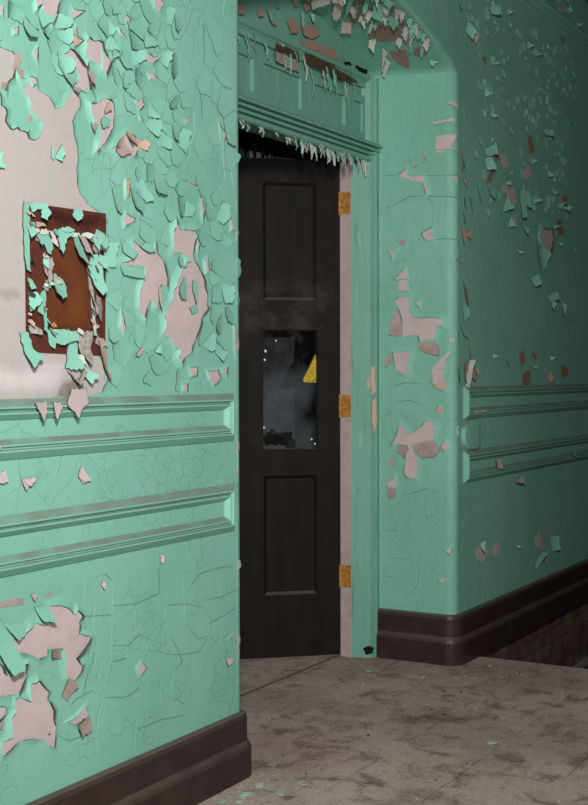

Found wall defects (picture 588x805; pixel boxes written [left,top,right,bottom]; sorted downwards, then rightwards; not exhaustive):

peeling [282,0,441,98]
peeling [275,132,368,176]
peeling [390,0,577,287]
flaking render [0,0,269,421]
peeling [385,264,481,393]
peeling [367,366,377,433]
peeling [386,404,459,498]
peeling [476,541,500,563]
peeling [533,532,561,569]
peeling [0,591,99,768]
crack [58,562,235,752]
peeling [224,610,240,691]